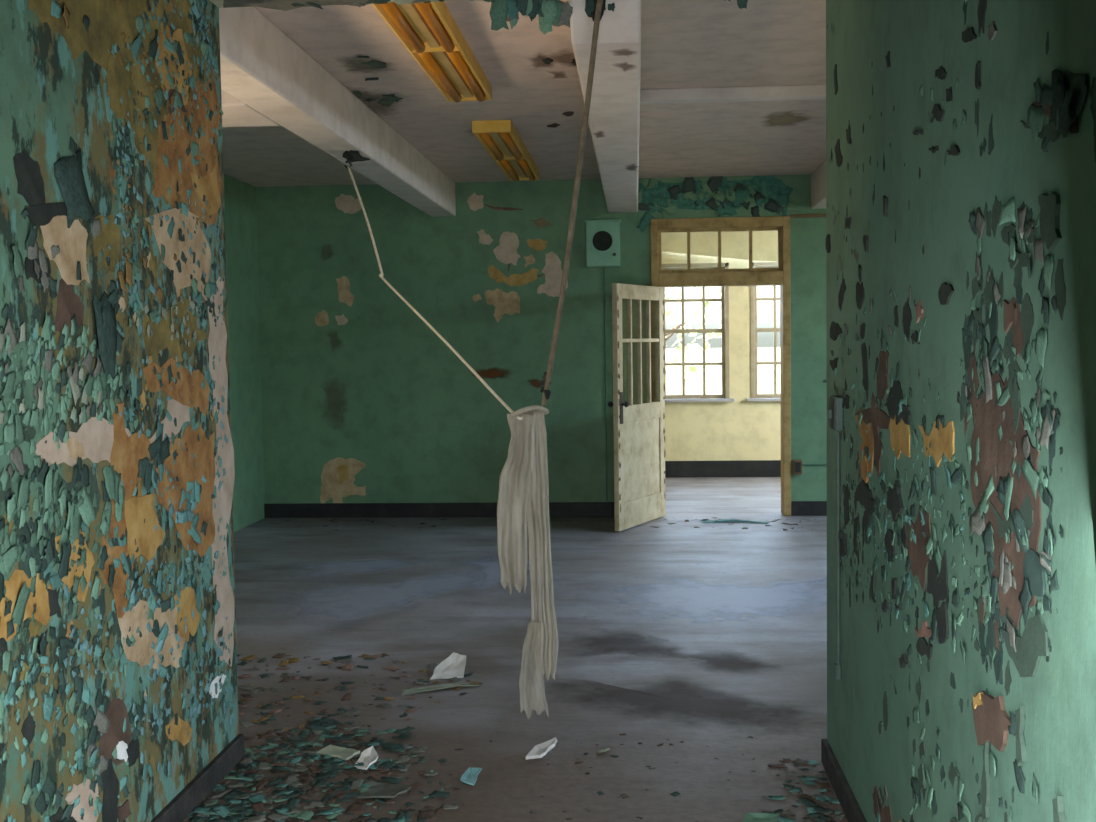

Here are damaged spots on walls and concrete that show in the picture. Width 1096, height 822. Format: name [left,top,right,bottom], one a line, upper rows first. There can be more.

peeling [223,0,445,11]
peeling [471,0,616,34]
water stain [347,56,403,113]
water stain [534,54,576,78]
peeling [829,121,890,173]
flaking render [335,194,362,214]
flaking render [467,192,524,211]
peeling [637,175,802,233]
flaking render [473,229,568,322]
flaking render [315,276,354,326]
peeling [0,0,235,822]
flaking render [320,457,366,503]